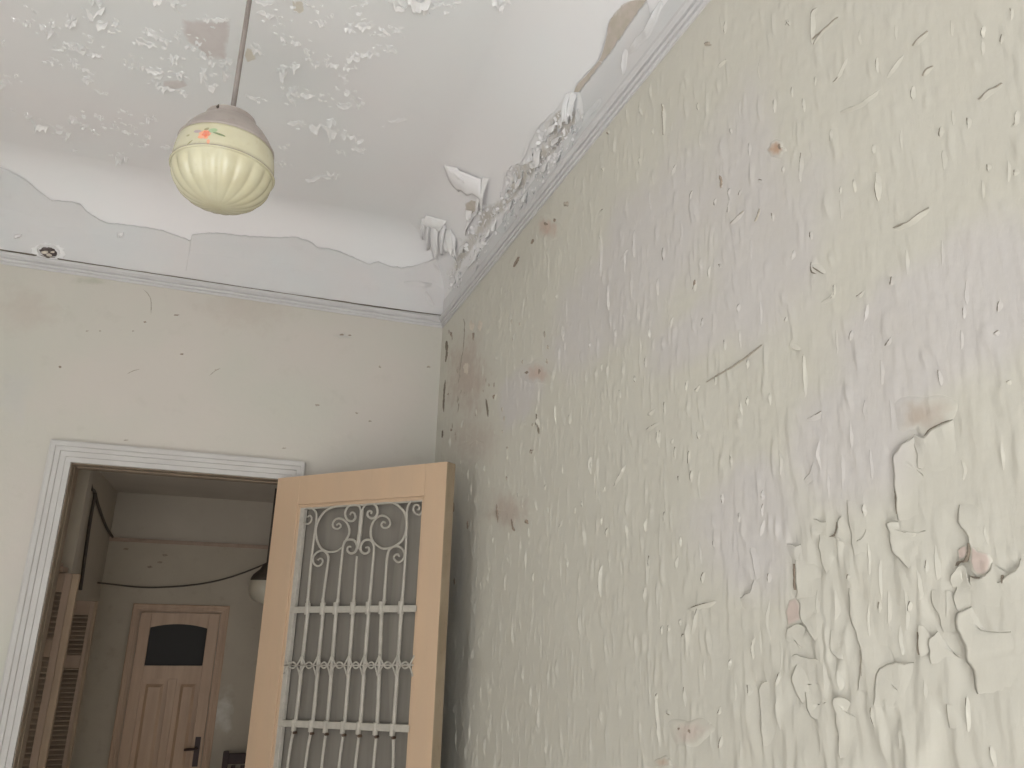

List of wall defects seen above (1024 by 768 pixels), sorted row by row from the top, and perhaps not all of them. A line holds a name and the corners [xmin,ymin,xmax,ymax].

peeling [0,0,663,309]
peeling [785,544,823,649]
peeling [835,500,865,556]
peeling [885,419,956,569]
peeling [848,504,1024,708]
peeling [791,664,856,758]